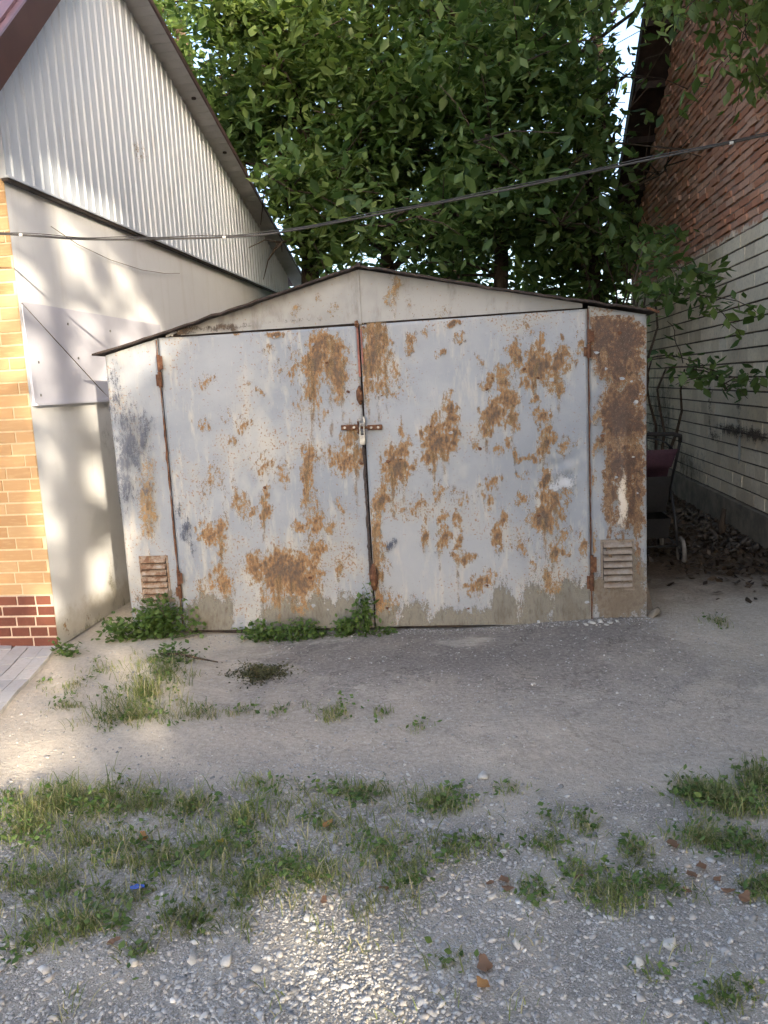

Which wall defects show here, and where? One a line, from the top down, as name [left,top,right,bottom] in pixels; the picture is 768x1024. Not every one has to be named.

rust [135,459,158,539]
rust [191,322,428,618]
rust [370,308,647,618]